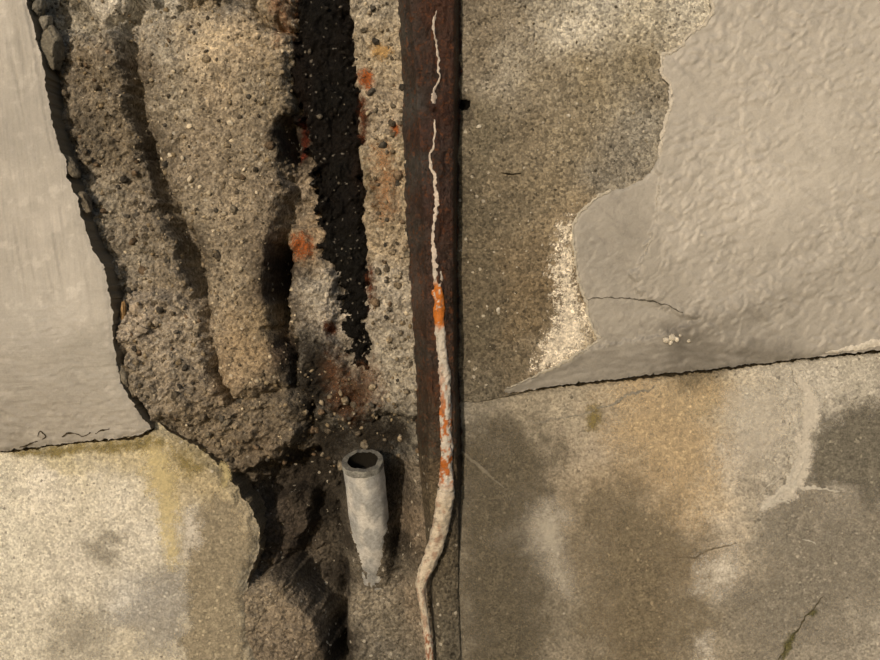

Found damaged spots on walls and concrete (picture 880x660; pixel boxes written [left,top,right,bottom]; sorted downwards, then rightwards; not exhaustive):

peeling [431,11,441,104]
rust [270,0,376,374]
peeling [429,119,439,268]
peeling [457,0,715,406]
spalling [31,0,434,660]
damp [529,214,592,372]
crack [588,297,683,313]
damp [121,494,253,660]
damp [460,425,568,660]
crack [527,339,880,511]
crack [778,597,823,660]
damp [747,373,880,643]